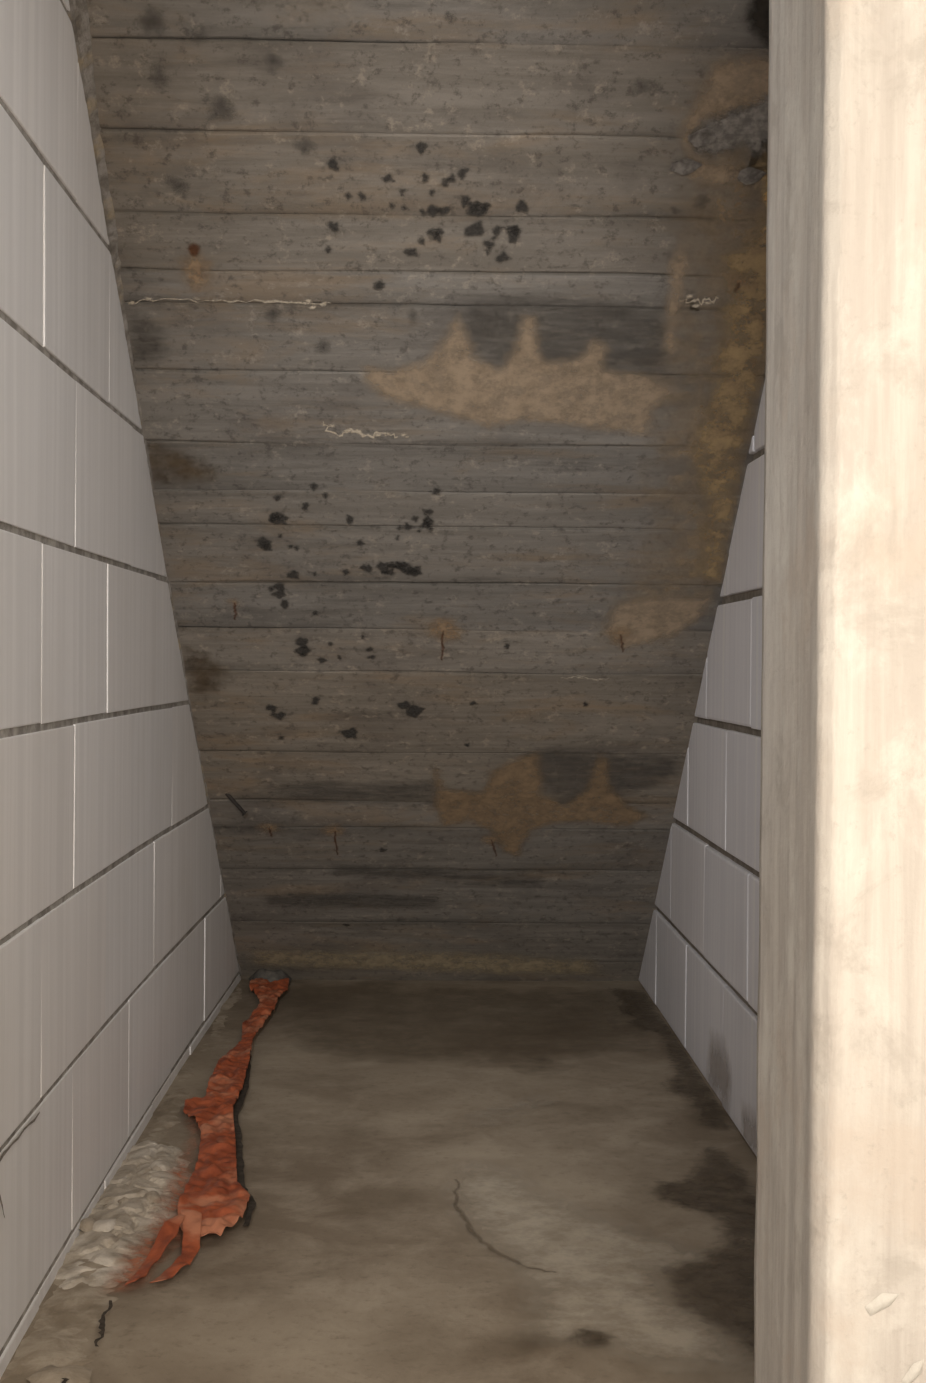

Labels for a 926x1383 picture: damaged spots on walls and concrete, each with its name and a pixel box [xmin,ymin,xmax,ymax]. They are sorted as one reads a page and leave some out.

spalling [670,96,768,185]
leakage [683,0,769,143]
leakage [367,255,718,433]
leakage [609,599,709,647]
leakage [457,1148,756,1360]